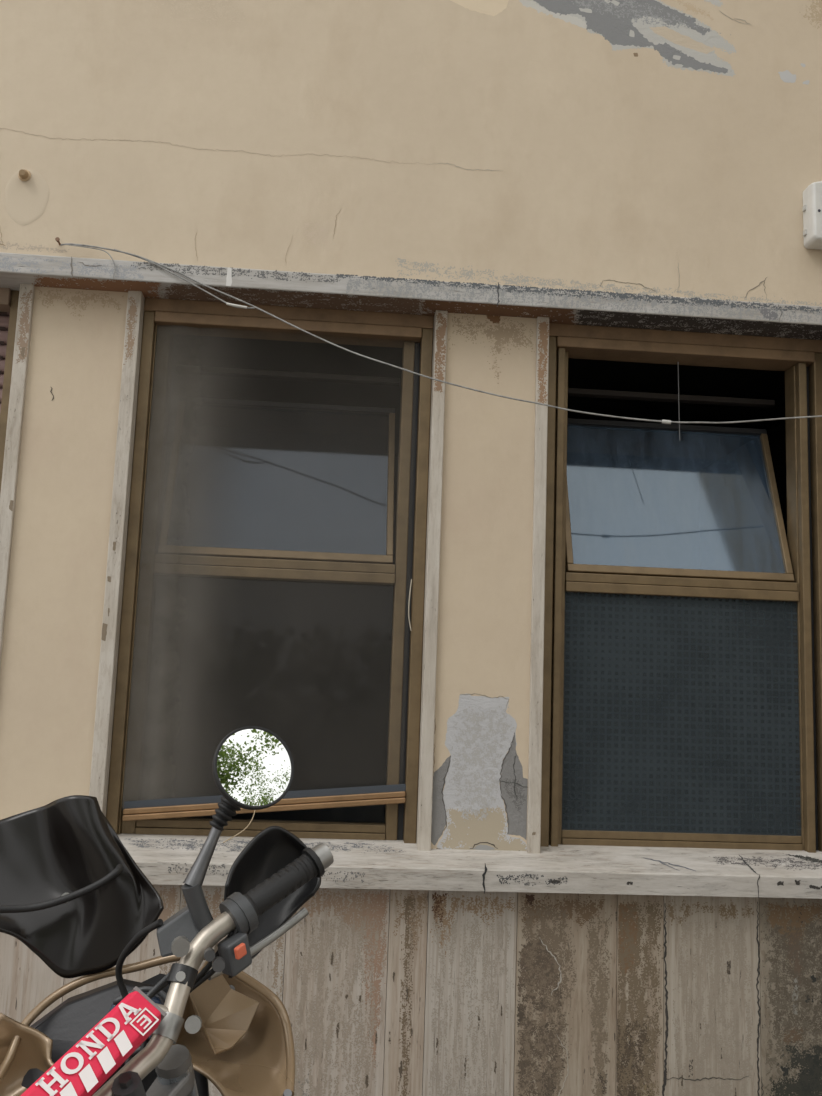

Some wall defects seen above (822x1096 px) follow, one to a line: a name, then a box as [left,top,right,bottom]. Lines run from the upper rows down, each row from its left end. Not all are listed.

spalling [450,0,736,77]
peeling [431,694,536,851]
damp [126,837,250,876]
damp [497,874,568,886]
crack [643,857,695,871]
damp [243,870,389,1096]
damp [397,897,416,1096]
damp [428,900,822,1096]
crack [662,855,764,1096]